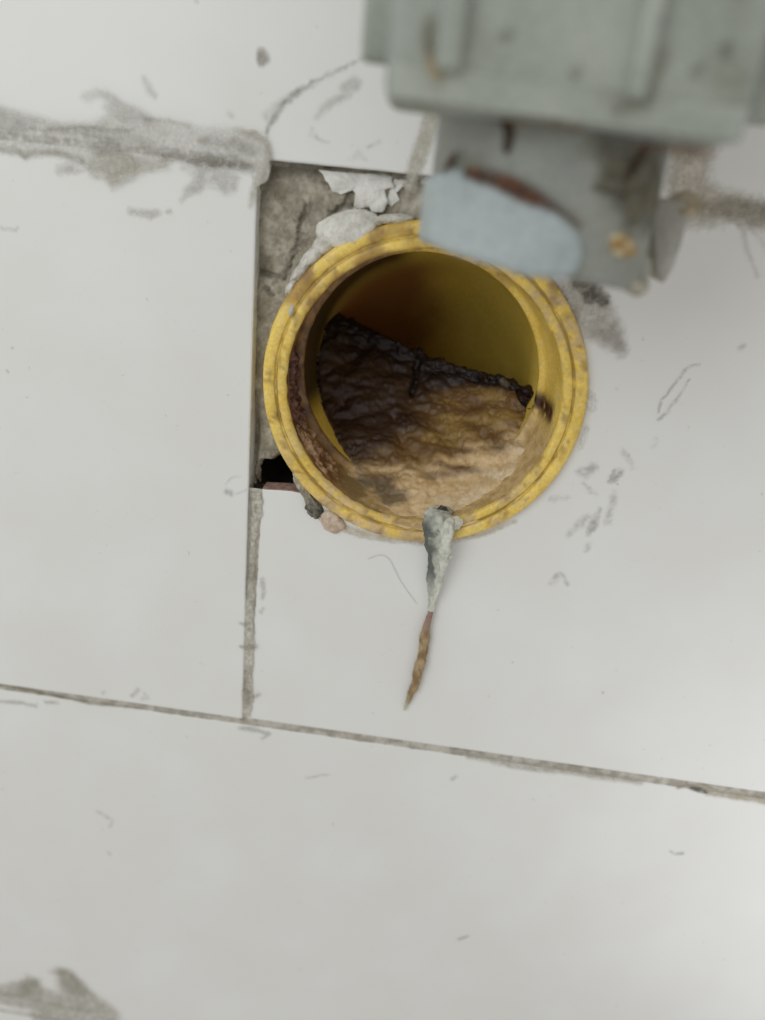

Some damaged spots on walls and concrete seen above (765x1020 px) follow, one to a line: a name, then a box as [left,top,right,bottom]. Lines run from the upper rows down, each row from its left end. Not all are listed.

spalling [254,161,424,487]